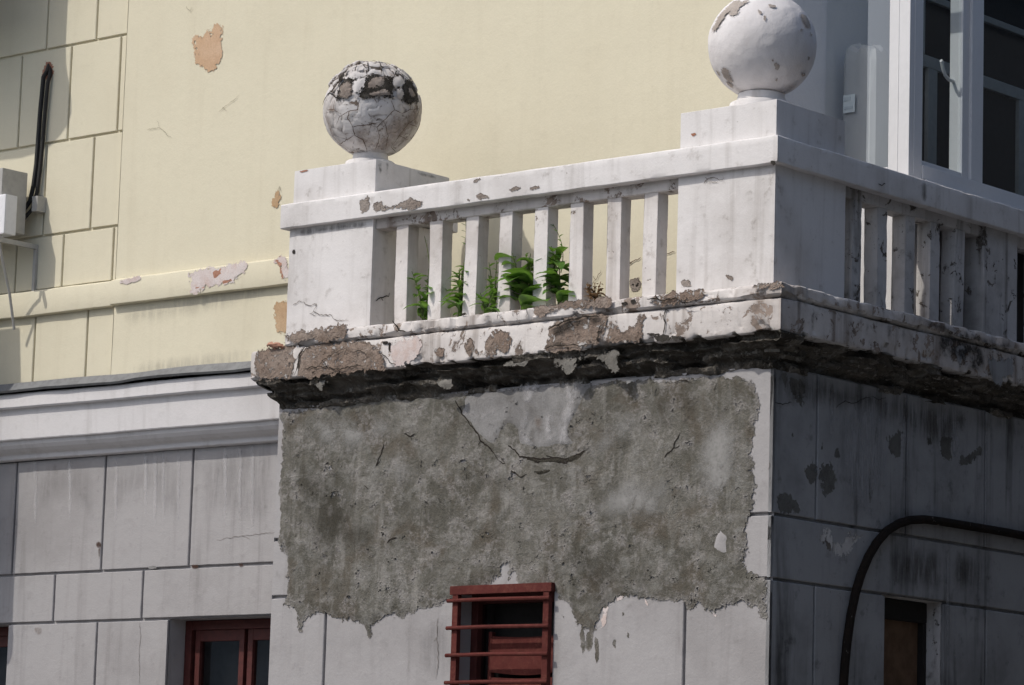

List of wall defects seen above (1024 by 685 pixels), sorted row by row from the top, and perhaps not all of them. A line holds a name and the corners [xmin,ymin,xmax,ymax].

peeling [712,0,749,32]
peeling [192,23,223,72]
crack [323,60,420,152]
spalling [336,69,419,105]
peeling [359,195,423,214]
spalling [254,300,422,391]
peeling [437,379,453,390]
peeling [462,277,704,474]
crack [455,401,589,478]
leakage [921,411,983,466]
leakage [804,442,840,497]
peeling [714,531,727,553]